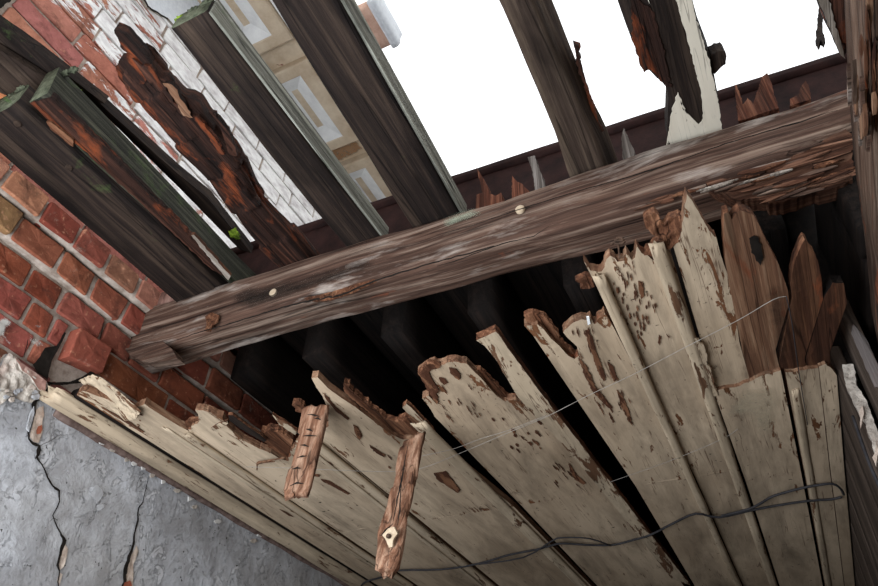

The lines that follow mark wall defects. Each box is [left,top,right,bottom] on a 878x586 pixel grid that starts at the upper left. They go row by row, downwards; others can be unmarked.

flaking render [0,332,95,405]
crack [26,383,68,586]
crack [121,473,149,586]